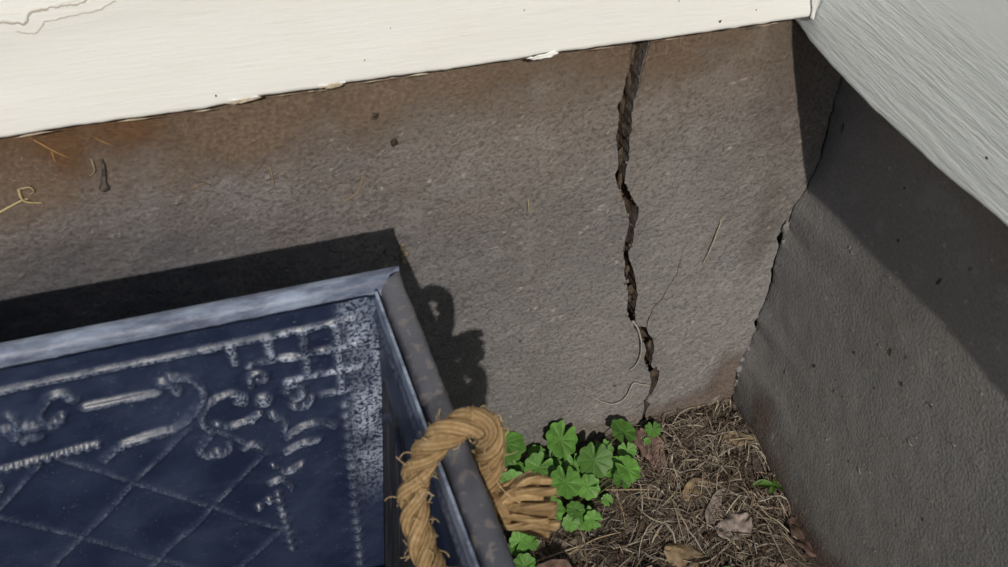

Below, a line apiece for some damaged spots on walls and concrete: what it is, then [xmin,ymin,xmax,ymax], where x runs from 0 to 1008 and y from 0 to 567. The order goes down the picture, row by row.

crack [0,0,114,34]
crack [614,40,681,420]